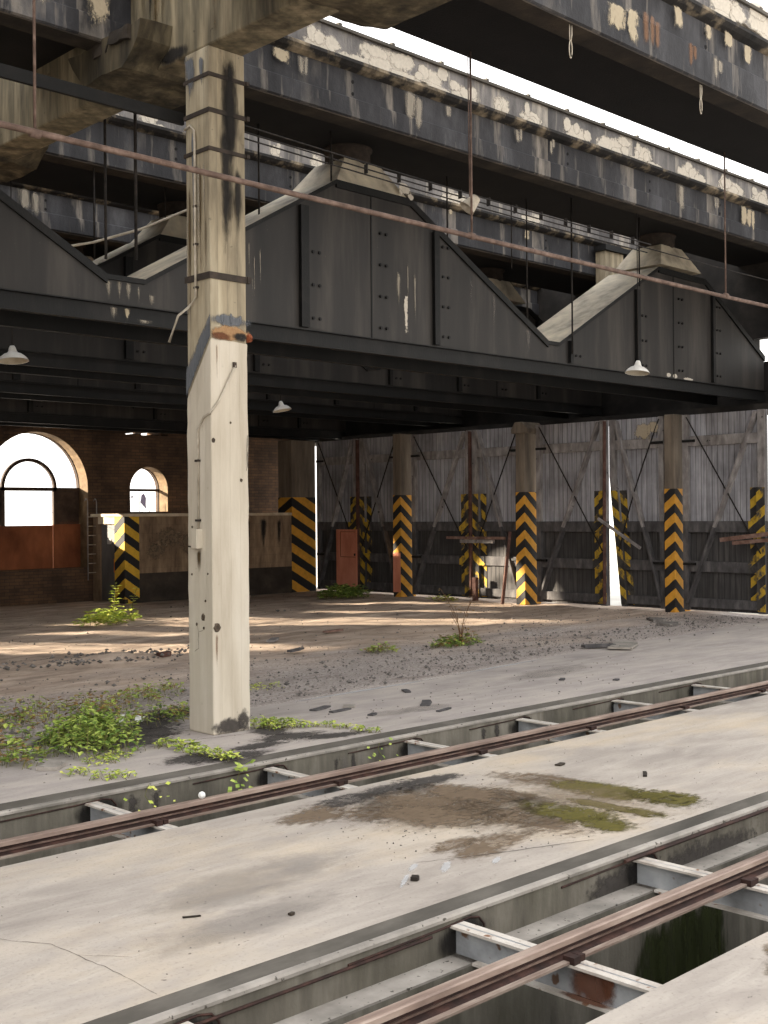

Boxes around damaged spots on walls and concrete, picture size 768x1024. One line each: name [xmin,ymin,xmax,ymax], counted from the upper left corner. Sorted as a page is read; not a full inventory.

corrosion [644,13,659,45]
peeling [304,24,477,102]
peeling [494,96,542,124]
water stain [221,63,242,232]
peeling [564,117,662,168]
peeling [399,183,414,200]
peeling [441,191,465,204]
peeling [677,162,768,205]
water stain [432,832,532,858]
corrosion [562,970,614,1008]